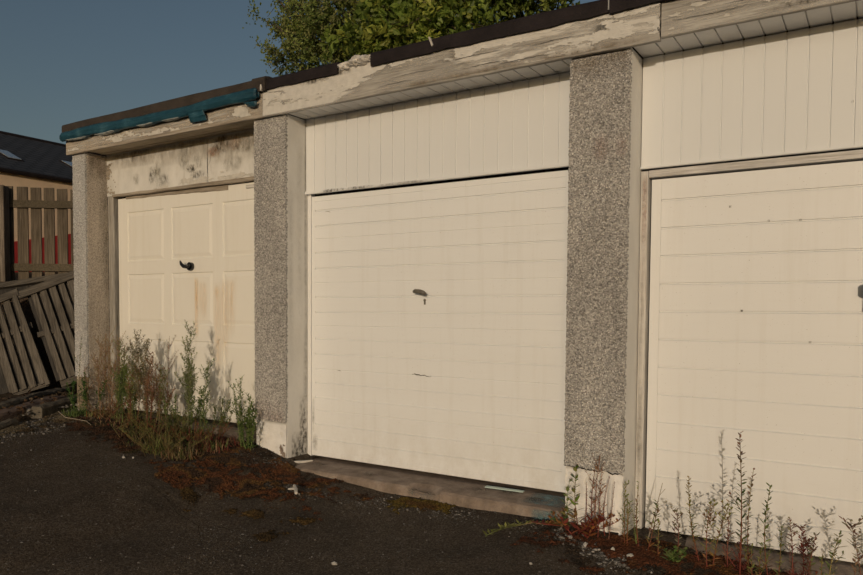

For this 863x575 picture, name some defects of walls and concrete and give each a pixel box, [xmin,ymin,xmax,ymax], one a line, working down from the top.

peeling [263,0,804,116]
peeling [68,104,250,152]